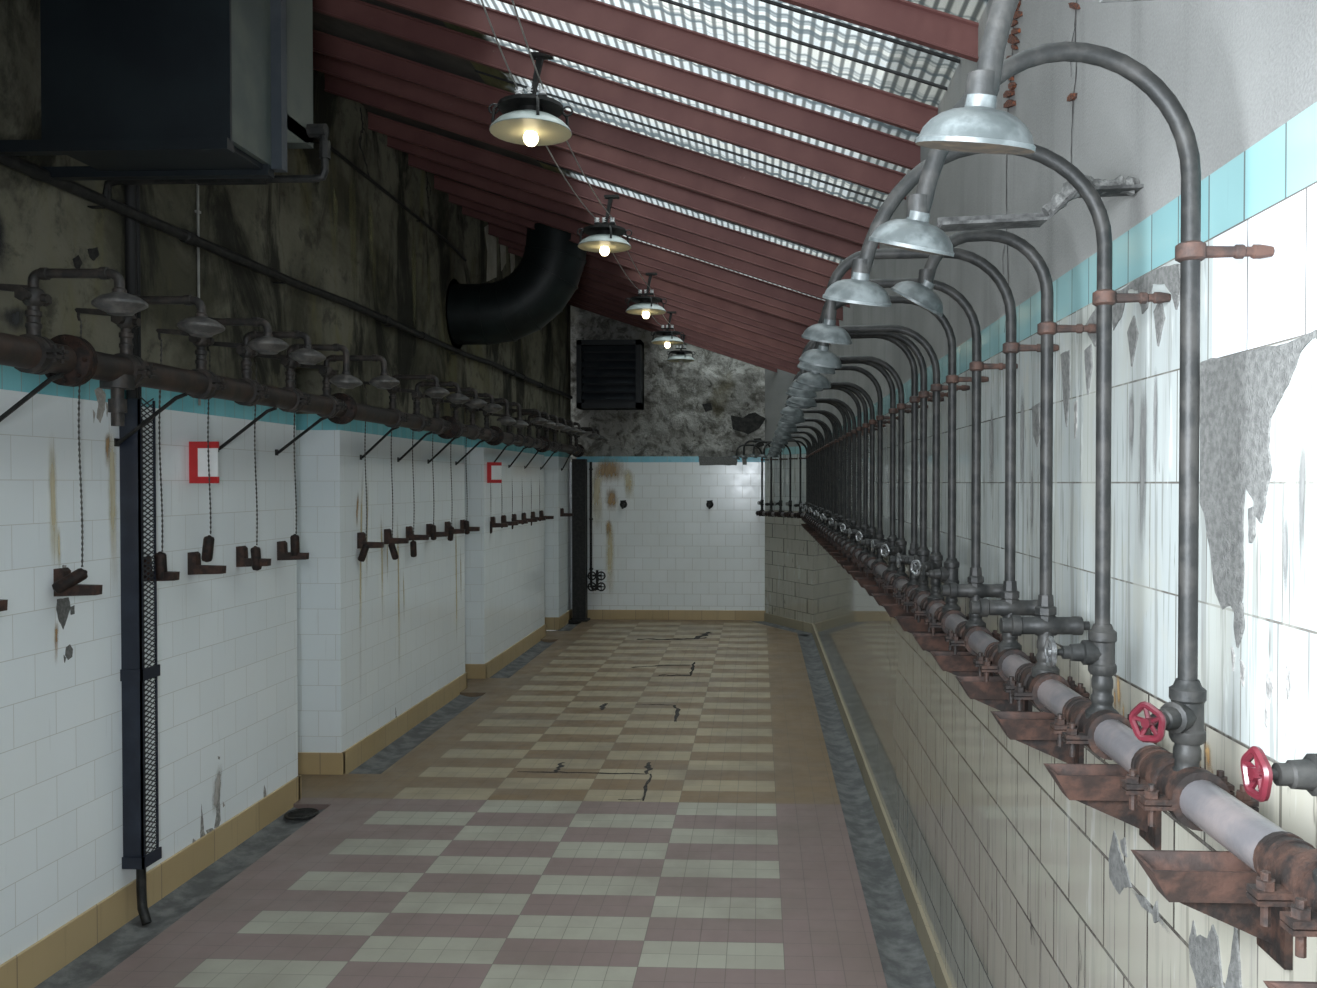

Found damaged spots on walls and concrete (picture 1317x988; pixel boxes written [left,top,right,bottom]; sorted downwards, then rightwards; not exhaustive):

corrosion [595,462,629,506]
spalling [1199,329,1317,687]
spalling [56,597,75,629]
spalling [64,644,73,663]
crack [517,762,653,801]
spalling [1108,830,1163,925]
spalling [1189,920,1242,988]